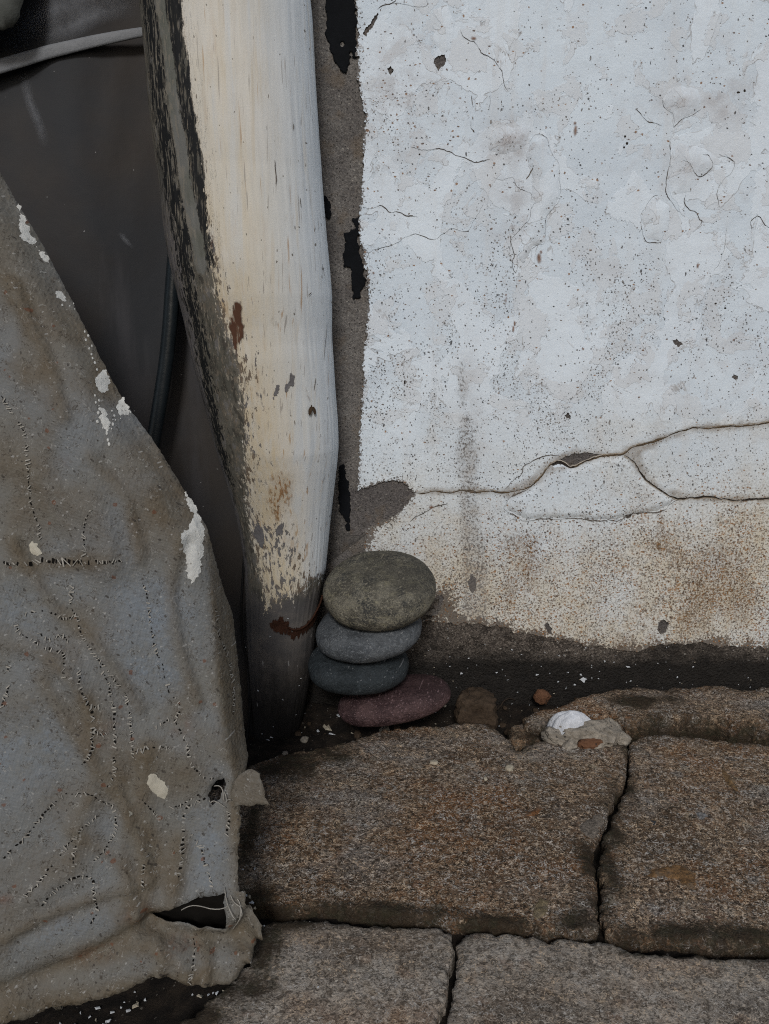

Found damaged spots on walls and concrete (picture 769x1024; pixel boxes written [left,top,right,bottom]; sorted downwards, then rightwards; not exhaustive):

crack [364,205,480,255]
crack [506,134,561,273]
crack [637,100,768,270]
peeling [311,0,414,565]
crack [411,420,769,521]
corrosion [270,594,323,641]
peeling [314,587,329,650]